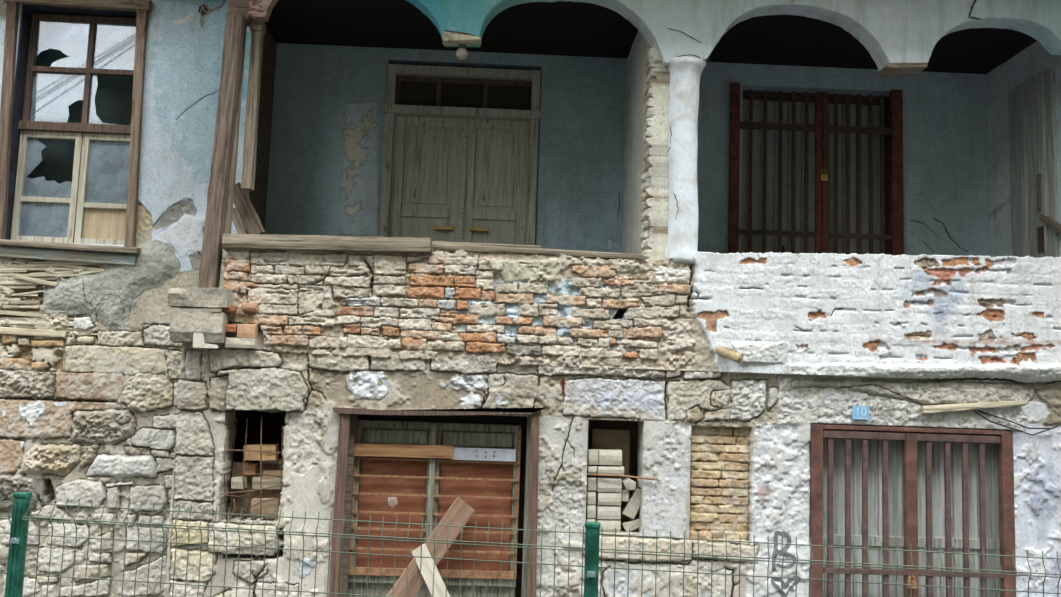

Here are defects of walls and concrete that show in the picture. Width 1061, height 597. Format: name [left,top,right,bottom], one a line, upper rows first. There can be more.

crack [969,0,981,20]
flaking render [137,197,197,235]
flaking render [189,251,202,270]
peeling [844,257,862,267]
peeling [904,257,1016,308]
peeling [698,310,729,332]
peeling [808,310,830,319]
peeling [896,298,1055,365]
peeling [863,341,889,363]